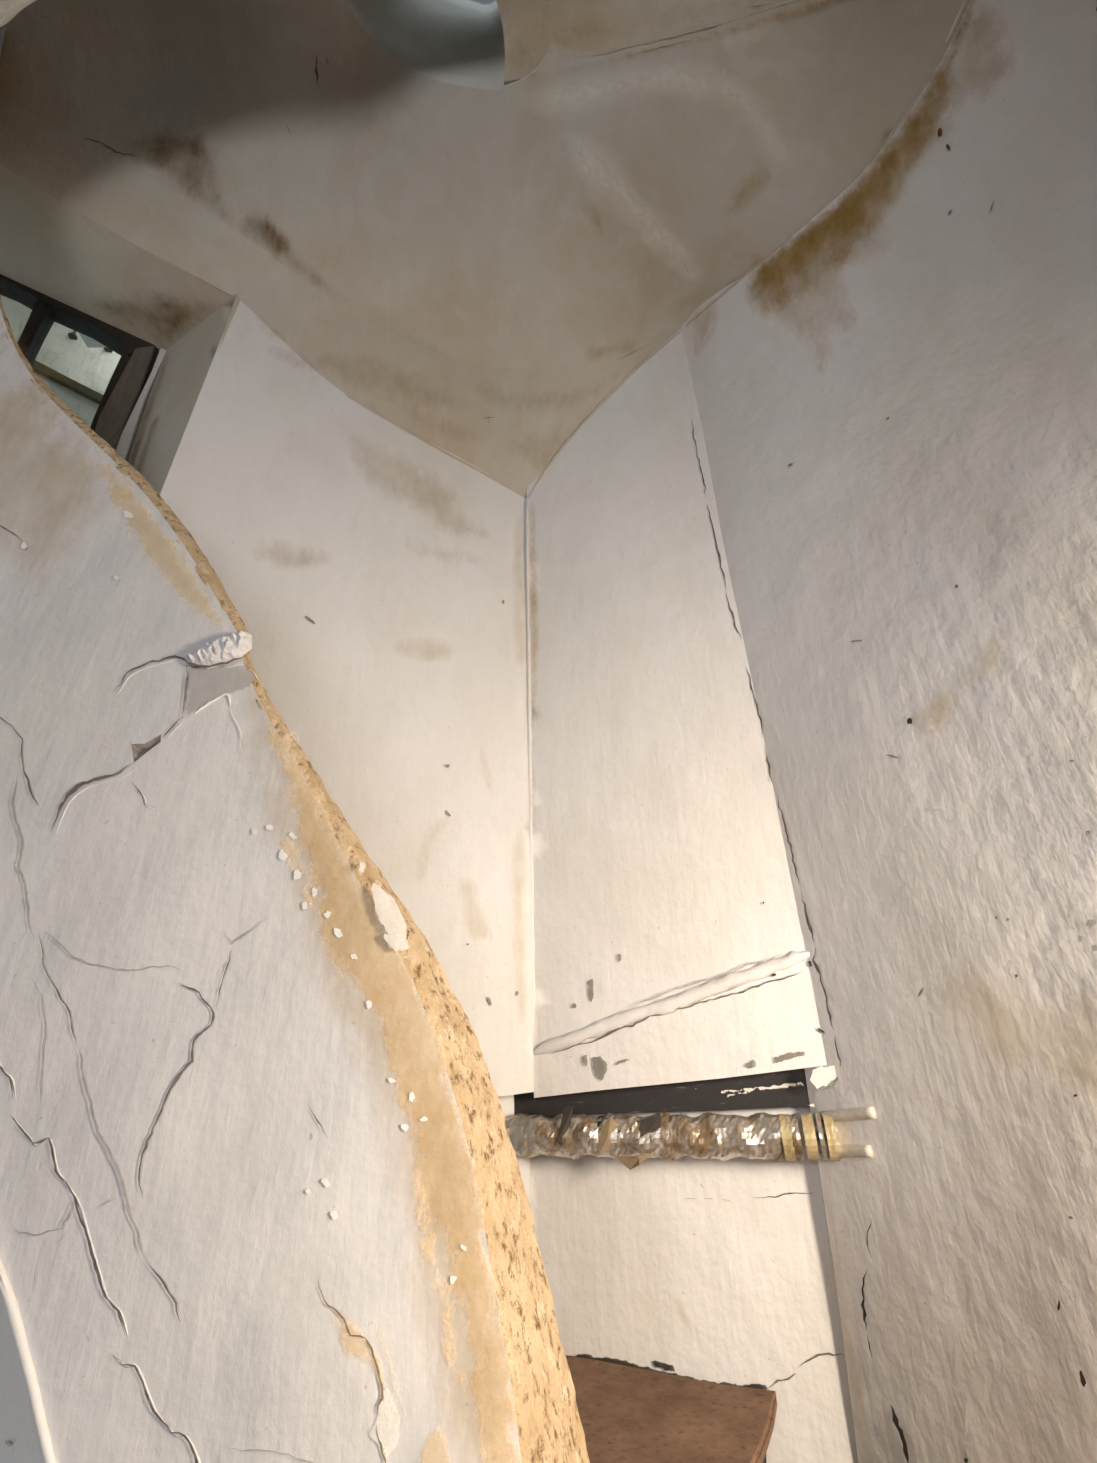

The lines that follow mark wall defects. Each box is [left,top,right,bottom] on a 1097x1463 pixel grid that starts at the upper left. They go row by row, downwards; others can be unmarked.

water stain [754,73,951,312]
spalling [131,735,161,762]
crack [112,655,184,695]
peeling [100,464,265,753]
crack [692,424,841,1091]
crack [0,717,313,1463]
water stain [300,838,391,1057]
peeling [251,720,521,1463]
crack [318,1281,386,1463]
water stain [412,1115,491,1431]